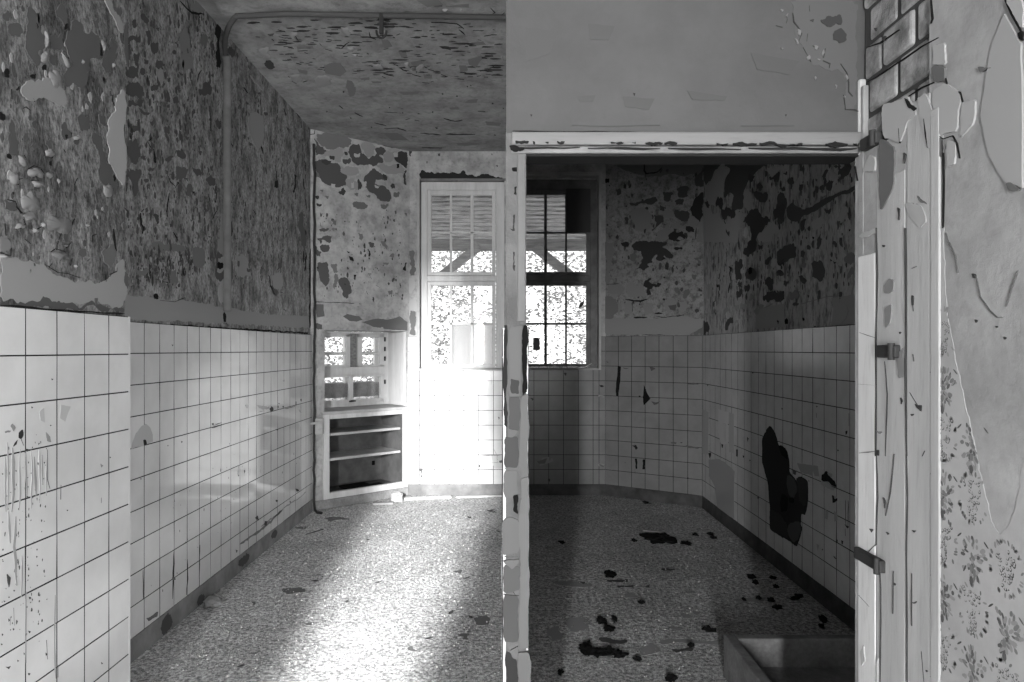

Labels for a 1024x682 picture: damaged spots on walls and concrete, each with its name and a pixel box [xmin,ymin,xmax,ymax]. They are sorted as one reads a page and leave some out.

peeling [0,2,416,300]
peeling [247,18,504,87]
crack [776,0,939,112]
peeling [791,0,946,220]
peeling [607,172,700,313]
peeling [698,165,853,315]
peeling [605,296,641,319]
peeling [503,325,519,427]
spalling [505,651,518,682]